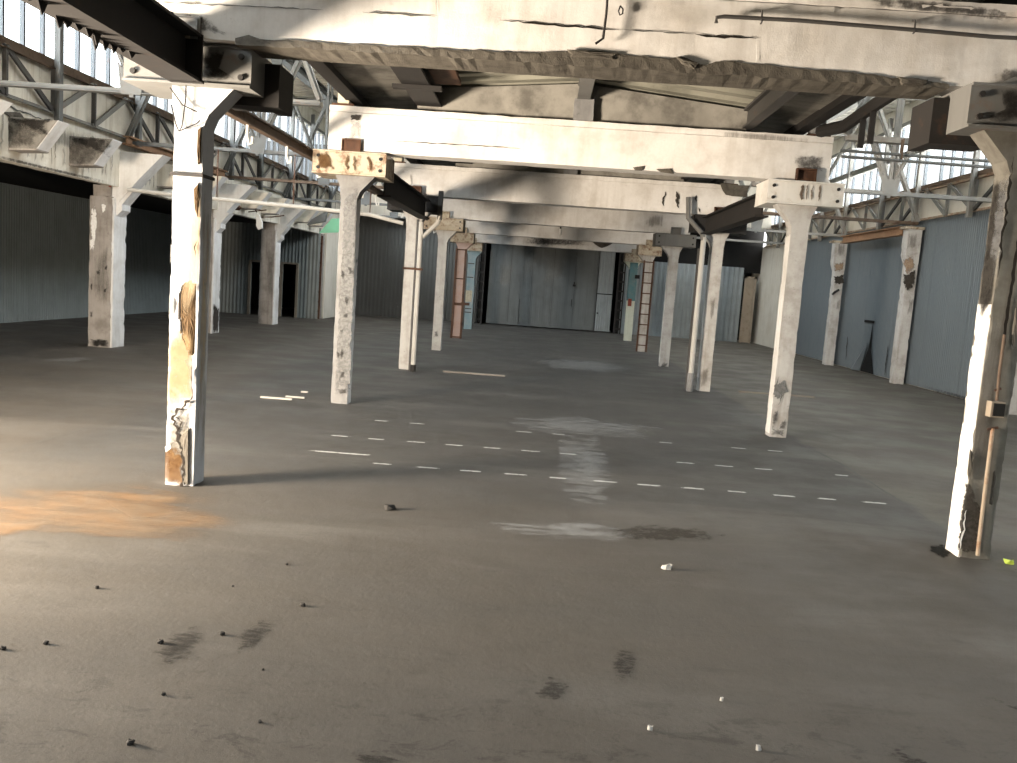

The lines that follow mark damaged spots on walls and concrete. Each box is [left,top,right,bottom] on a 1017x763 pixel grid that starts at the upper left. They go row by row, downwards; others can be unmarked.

crack [159,2,318,10]
crack [365,10,435,18]
crack [503,20,757,61]
rust [318,152,371,170]
spalling [169,282,196,355]